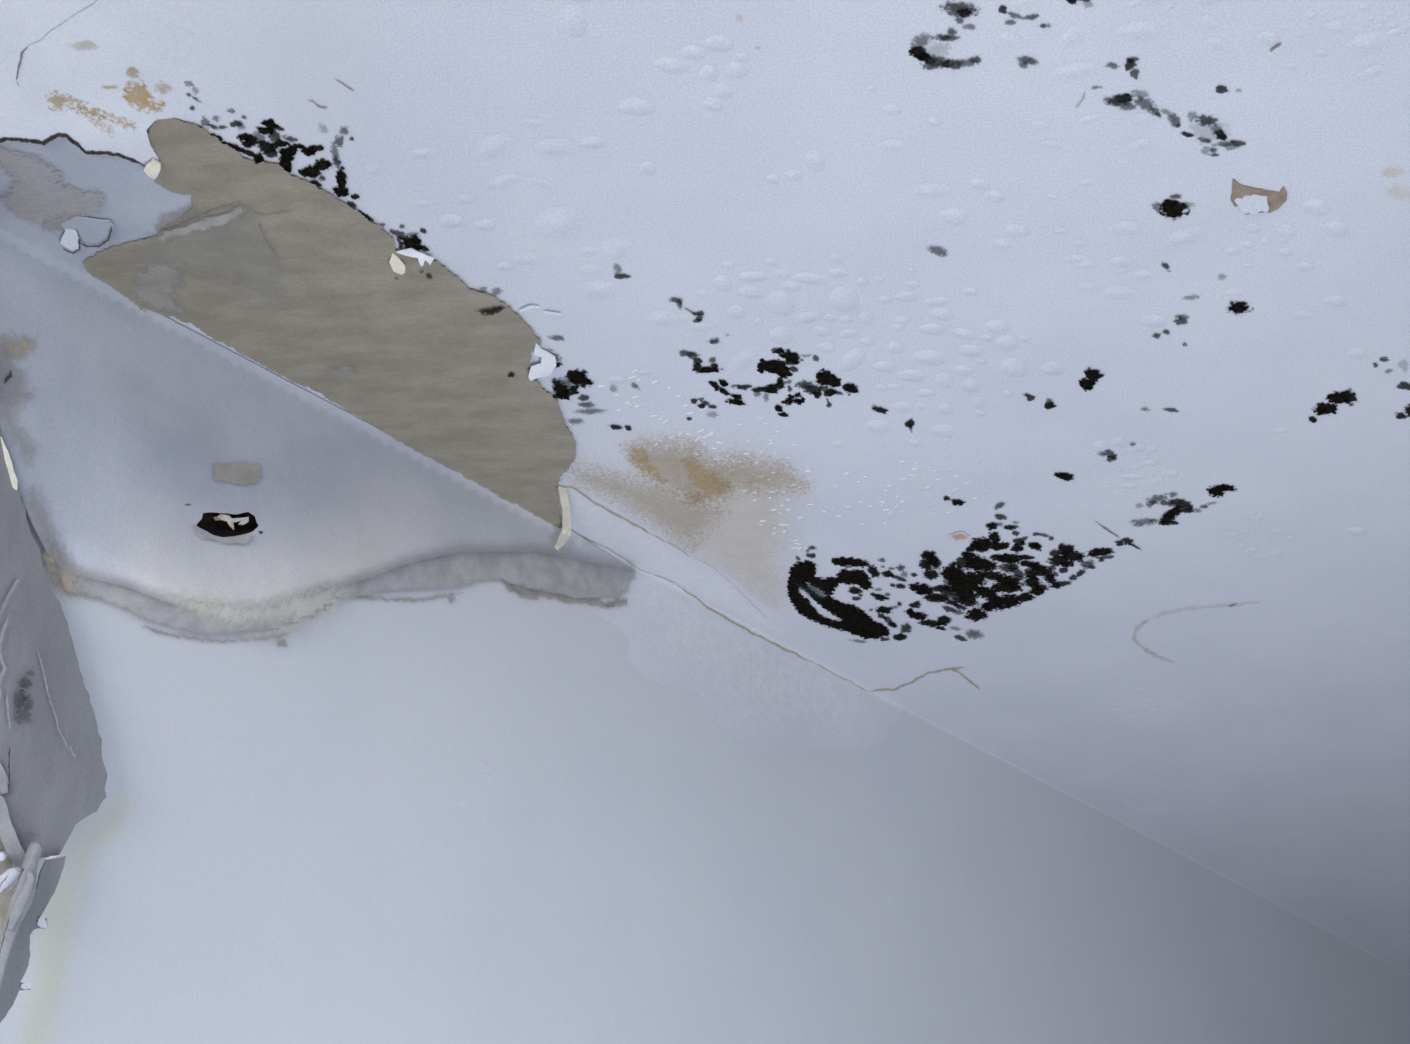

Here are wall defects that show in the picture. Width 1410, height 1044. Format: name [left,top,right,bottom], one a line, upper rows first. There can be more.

crack [16,47,28,80]
corrosion [47,91,106,120]
corrosion [101,67,165,113]
water stain [908,3,982,70]
water stain [1105,58,1246,157]
water stain [187,93,429,252]
peeling [1231,179,1287,215]
water stain [679,348,858,421]
water stain [1309,388,1357,423]
flaking render [0,0,637,1023]
water stain [1147,484,1237,526]
water stain [786,503,1141,642]